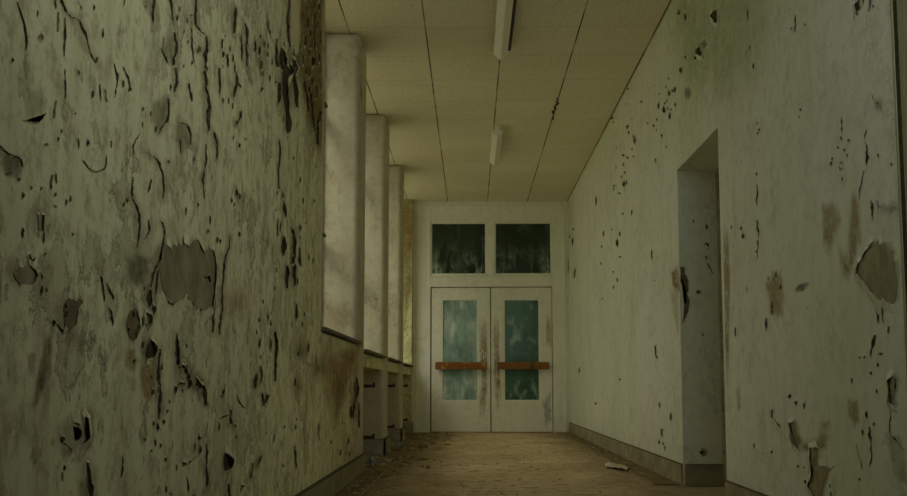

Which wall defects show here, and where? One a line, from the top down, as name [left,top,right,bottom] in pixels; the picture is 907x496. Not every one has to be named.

peeling [254,0,323,147]
peeling [142,98,192,154]
spalling [1,145,72,208]
spalling [160,216,222,335]
peeling [276,217,314,327]
spalling [680,267,701,324]
spalling [854,233,897,314]
peeling [127,297,208,462]
peeling [870,361,898,413]
peeling [61,402,92,478]
spalling [224,445,235,479]
spalling [787,392,833,496]